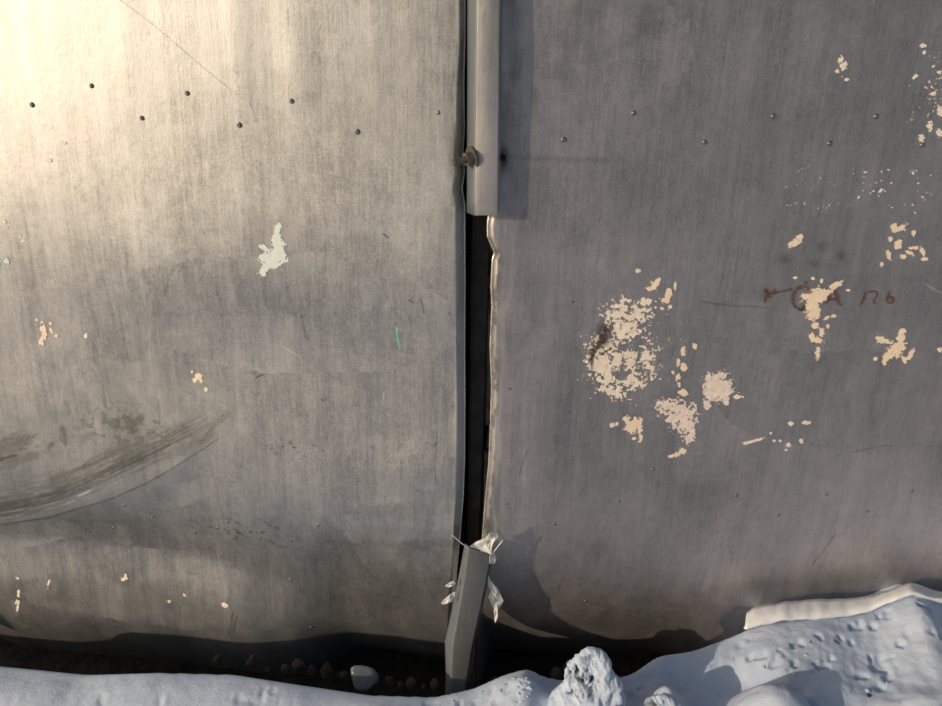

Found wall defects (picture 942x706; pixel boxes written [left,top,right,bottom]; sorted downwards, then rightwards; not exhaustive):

peeling [912,43,942,142]
peeling [256,222,289,277]
corrosion [590,326,610,365]
peeling [577,277,744,458]
peeling [799,277,850,361]
peeling [873,328,915,365]
leakage [0,429,185,511]